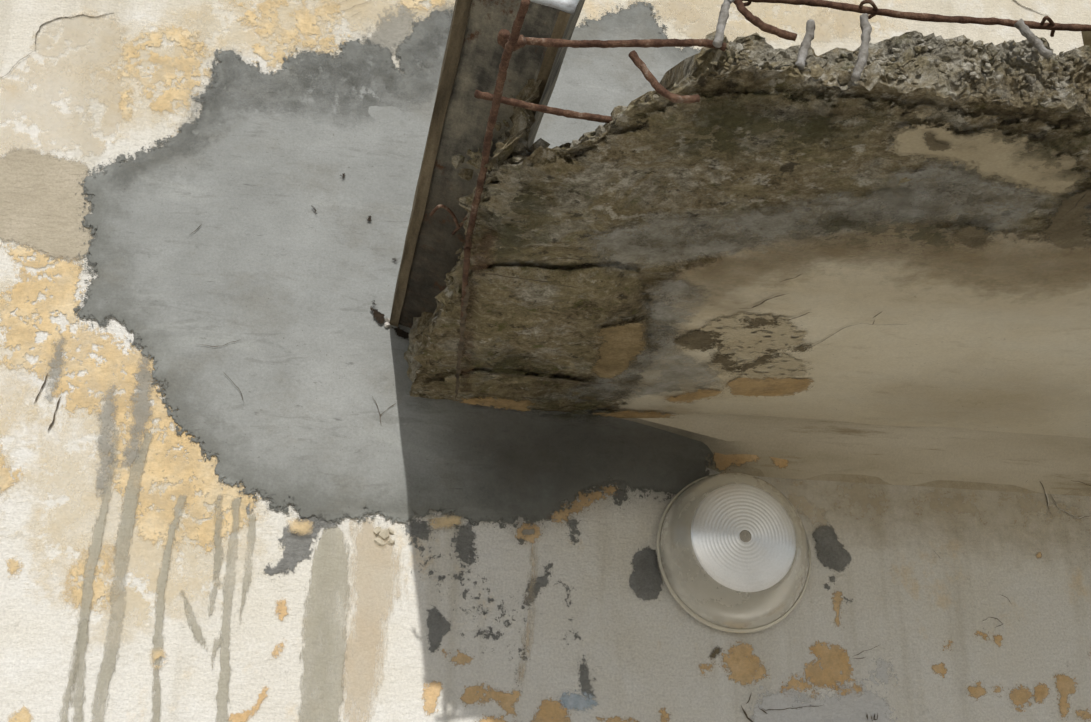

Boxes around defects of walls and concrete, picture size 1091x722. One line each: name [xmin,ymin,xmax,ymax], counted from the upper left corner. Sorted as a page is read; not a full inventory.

spalling [421,0,1091,418]
leakage [45,333,65,401]
peeling [0,148,261,553]
leakage [496,395,698,480]
leakage [60,357,155,722]
leakage [152,495,187,722]
leakage [183,495,256,722]
leakage [299,520,400,722]
peeling [442,598,531,722]
peeling [698,641,770,722]
peeling [780,640,863,699]
peeling [966,674,1091,722]